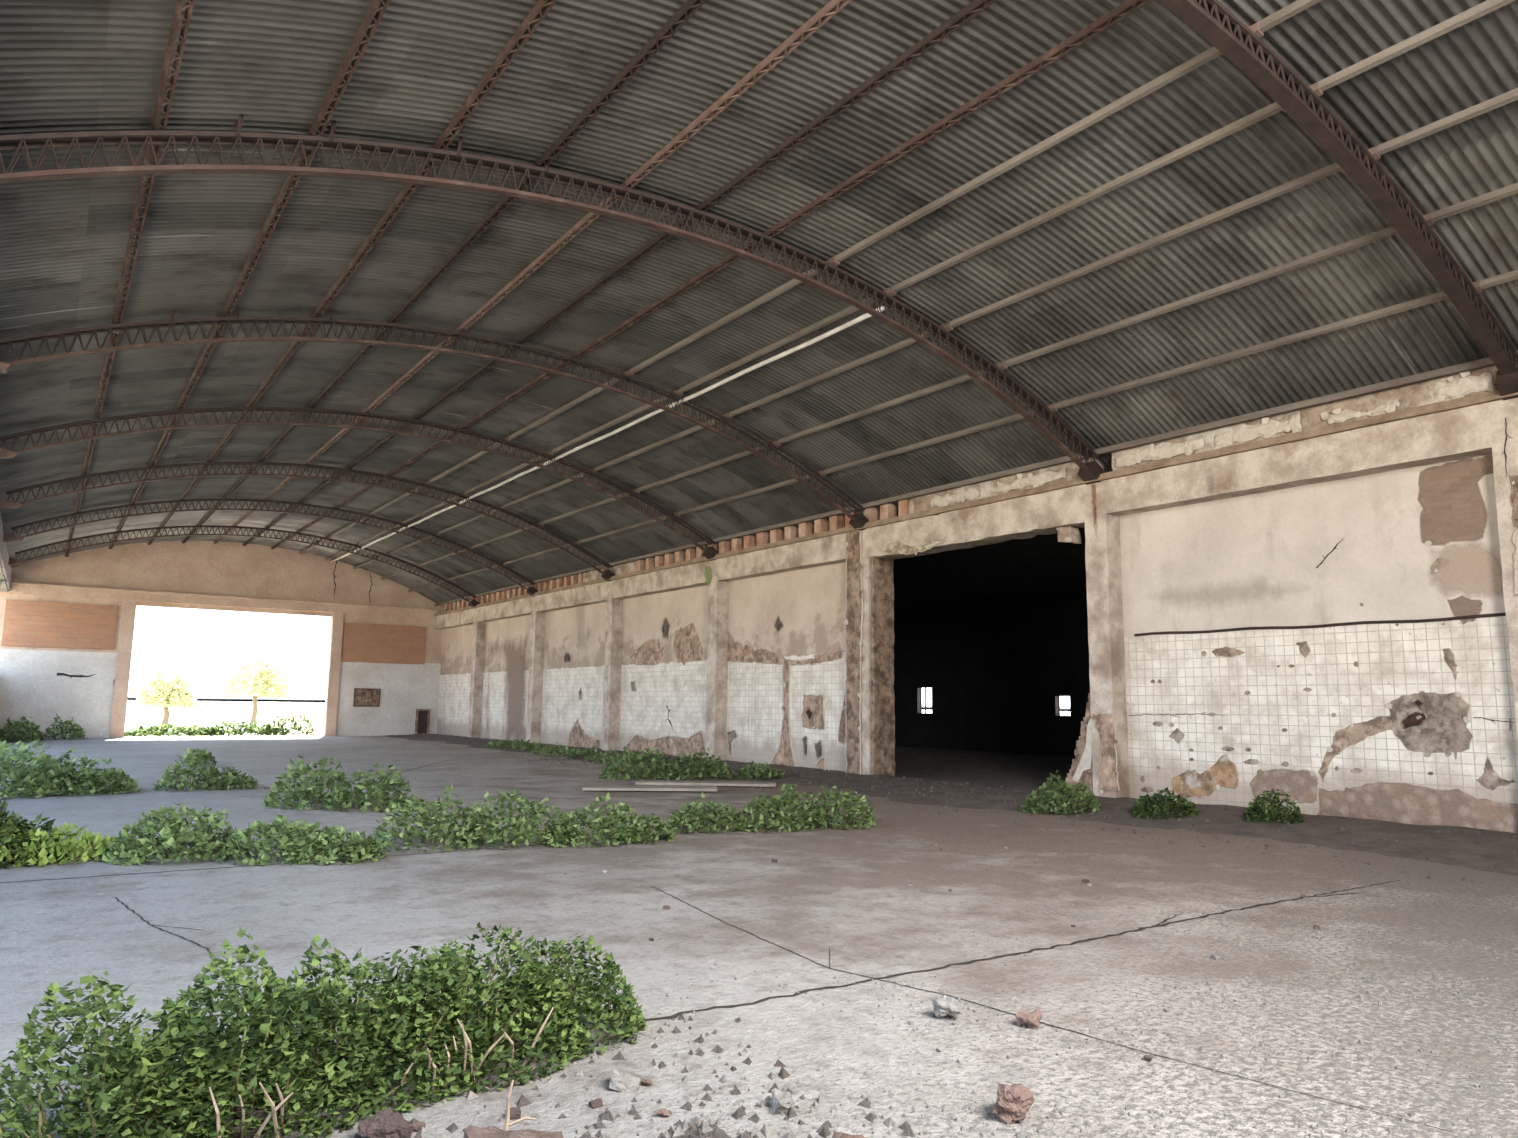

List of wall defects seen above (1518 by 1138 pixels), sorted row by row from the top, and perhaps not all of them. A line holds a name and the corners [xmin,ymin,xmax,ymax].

spalling [882,538,945,555]
flaking render [1417,454,1518,624]
spalling [630,622,706,692]
spalling [727,530,863,774]
peeling [567,719,601,749]
peeling [625,730,705,758]
spalling [1091,713,1120,794]
peeling [1140,648,1518,833]
crack [0,839,608,965]
crack [644,880,1463,1135]